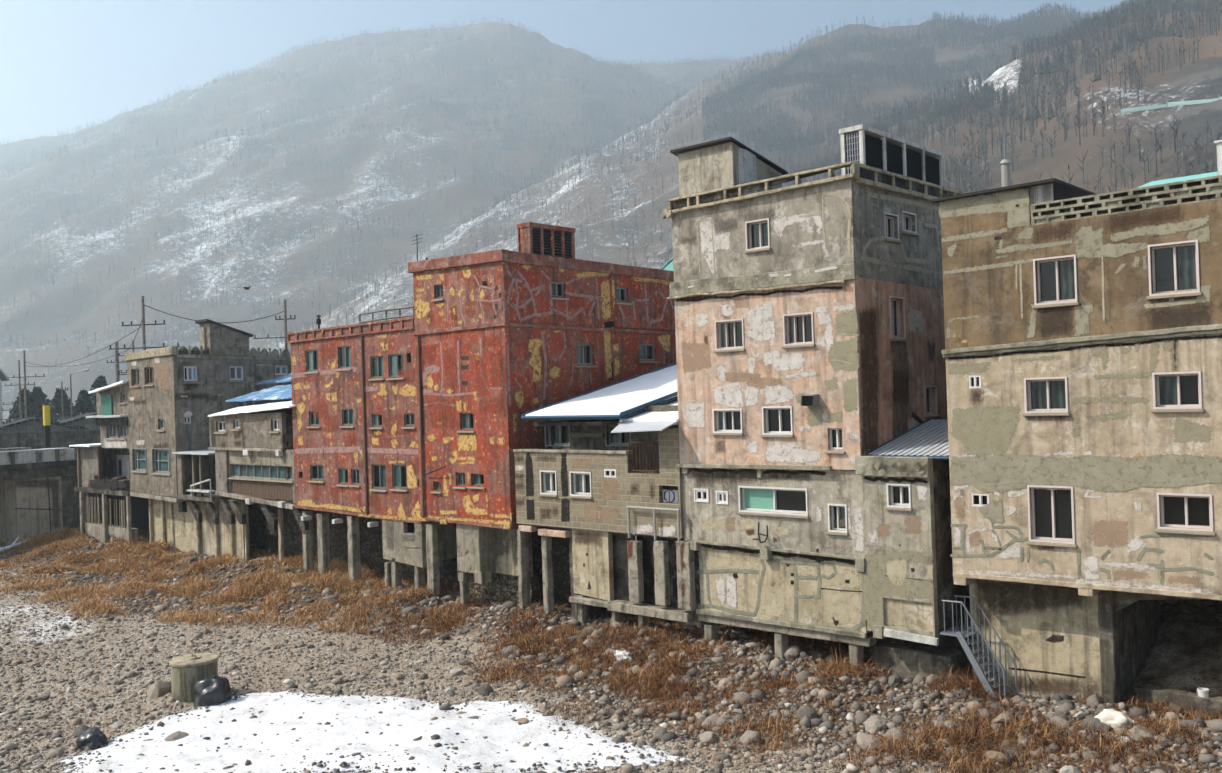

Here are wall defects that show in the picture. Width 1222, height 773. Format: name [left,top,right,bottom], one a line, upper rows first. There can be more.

damp [1036,223,1072,241]
damp [1111,209,1180,230]
peeling [755,266,838,279]
crack [422,266,675,407]
peeling [559,268,620,378]
peeling [658,296,860,429]
damp [949,290,1222,360]
peeling [293,329,561,530]
peeling [745,404,824,477]
peeling [633,524,676,537]
crack [950,522,1214,585]
crack [697,551,932,631]